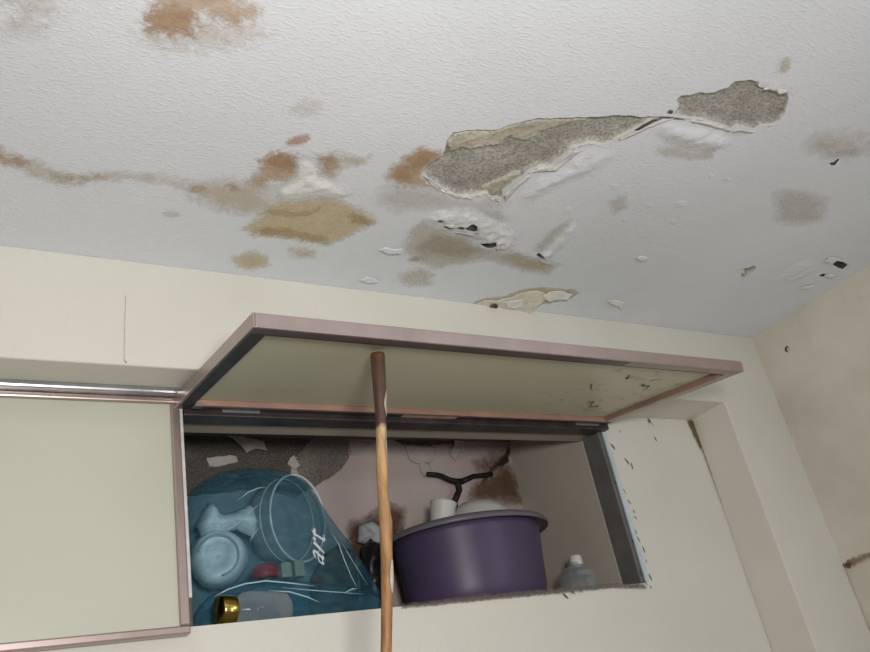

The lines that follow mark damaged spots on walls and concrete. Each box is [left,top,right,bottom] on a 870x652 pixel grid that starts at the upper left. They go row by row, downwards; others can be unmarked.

damp [148,0,256,35]
flaking render [422,80,789,201]
damp [391,150,440,186]
damp [192,154,372,244]
damp [409,224,552,272]
peeling [475,291,572,313]
peeling [184,391,464,498]